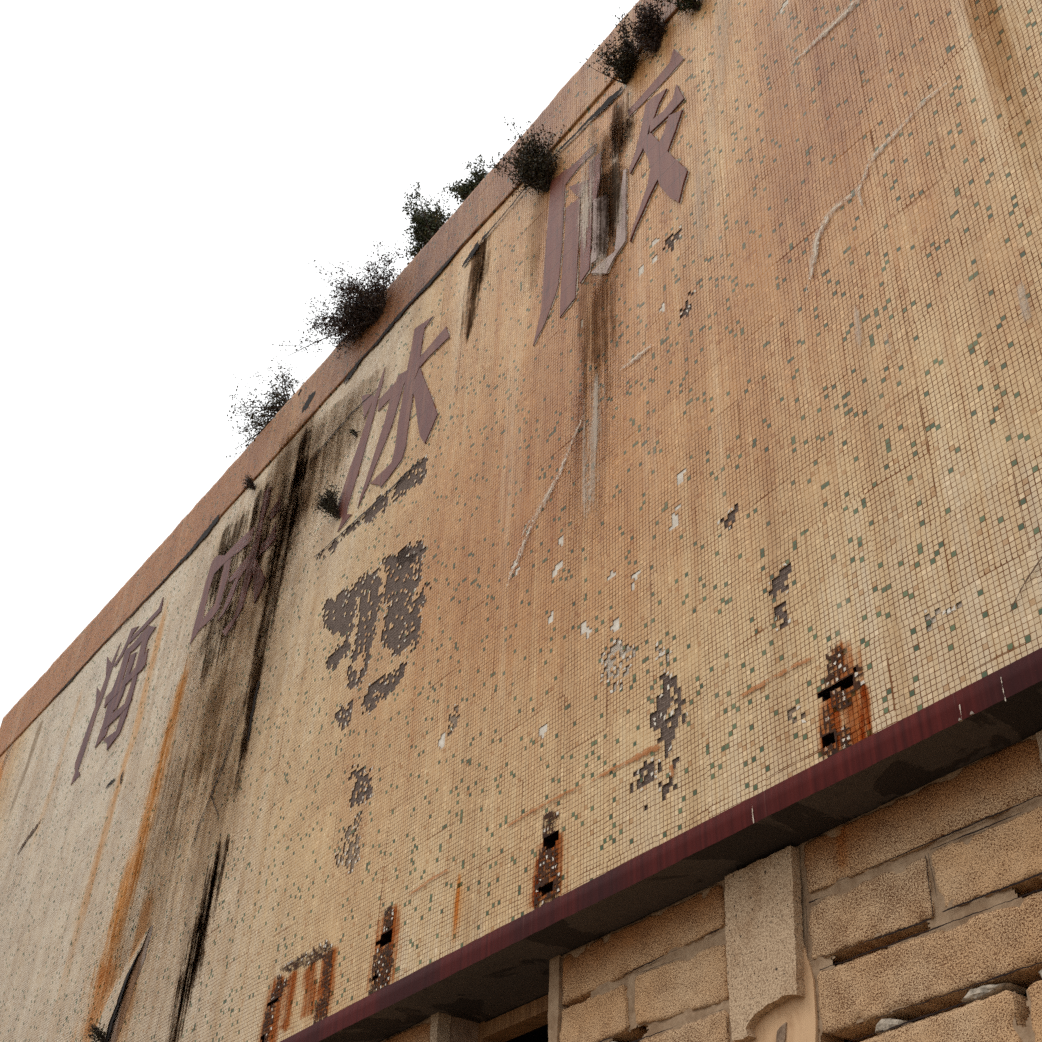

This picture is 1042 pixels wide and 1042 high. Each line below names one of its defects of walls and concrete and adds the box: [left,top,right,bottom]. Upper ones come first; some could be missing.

crack [791,0,859,64]
damp [578,92,634,265]
crack [806,83,947,291]
damp [457,237,490,342]
peeling [316,454,428,561]
damp [583,378,598,503]
damp [200,428,311,793]
peeling [322,539,432,731]
peeling [600,617,635,693]
peeling [630,641,688,801]
peeling [335,764,373,874]
damp [167,836,233,1042]